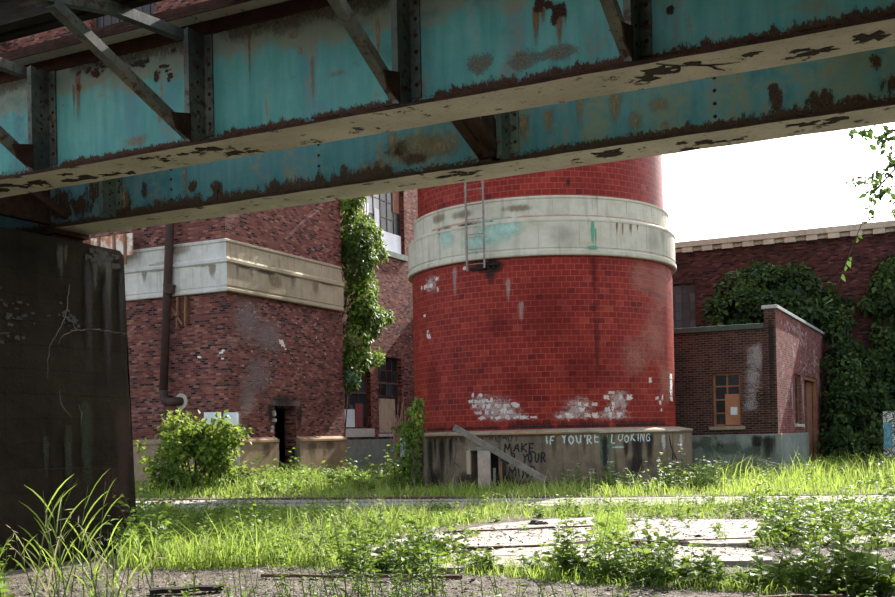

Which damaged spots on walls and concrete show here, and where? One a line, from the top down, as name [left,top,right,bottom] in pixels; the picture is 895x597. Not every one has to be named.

corrosion [434,0,628,98]
peeling [635,61,702,83]
corrosion [670,0,895,55]
peeling [852,30,892,43]
corrosion [560,68,895,151]
peeling [0,171,136,192]
corrosion [116,132,456,216]
crack [47,284,131,362]
peeling [468,393,537,421]
peeling [555,391,633,419]
leakage [419,421,682,477]
leakage [753,436,775,456]